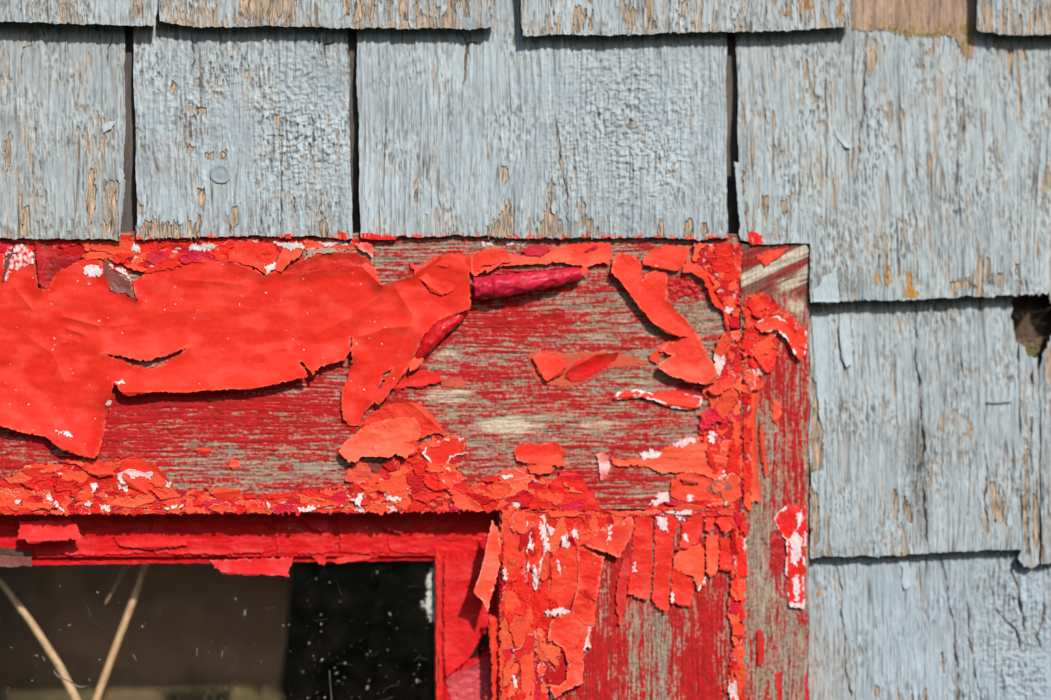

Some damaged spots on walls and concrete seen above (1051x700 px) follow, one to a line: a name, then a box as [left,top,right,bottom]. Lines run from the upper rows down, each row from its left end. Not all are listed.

peeling [3,131,13,180]
peeling [0,161,853,700]
crack [914,330,928,541]
crack [942,563,981,700]
crack [1006,564,1045,646]